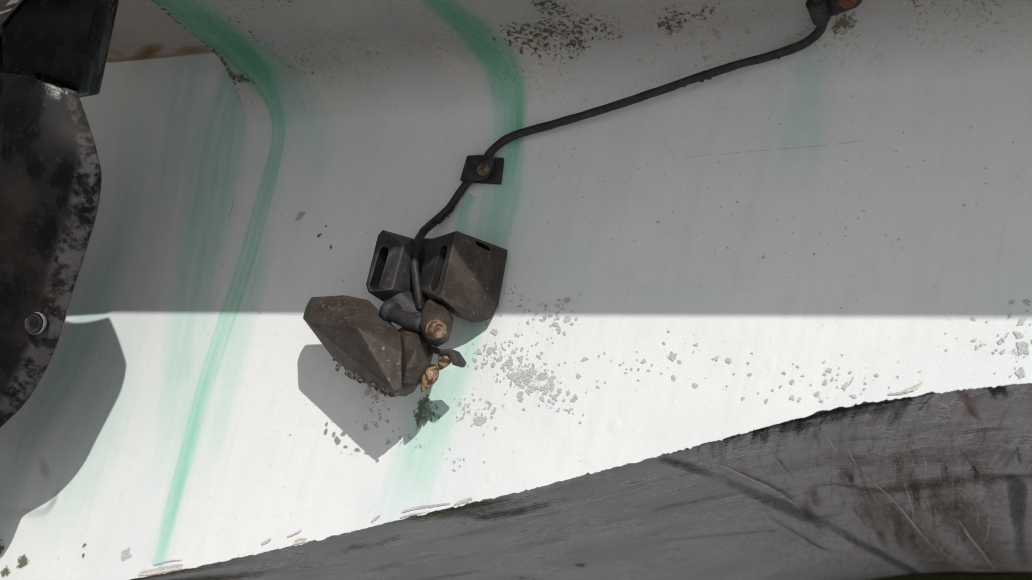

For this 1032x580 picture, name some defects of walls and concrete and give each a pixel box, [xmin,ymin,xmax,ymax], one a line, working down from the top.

damp [493,0,620,60]
damp [656,1,720,35]